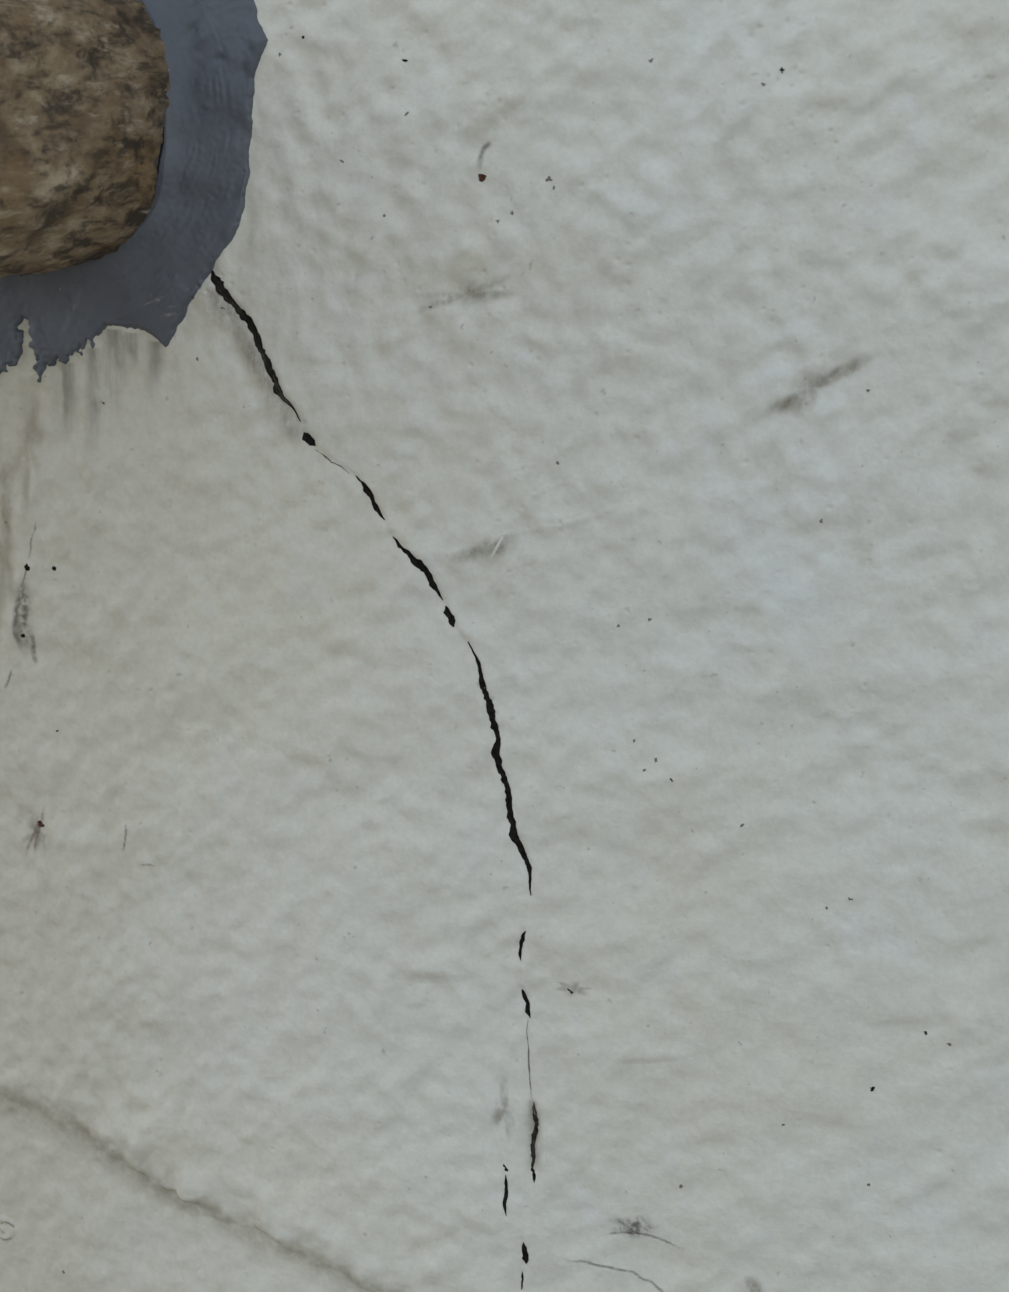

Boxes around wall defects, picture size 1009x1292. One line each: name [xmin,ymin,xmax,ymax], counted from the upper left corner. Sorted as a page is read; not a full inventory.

crack [211,270,532,895]
crack [503,931,539,1214]
crack [521,1242,529,1290]